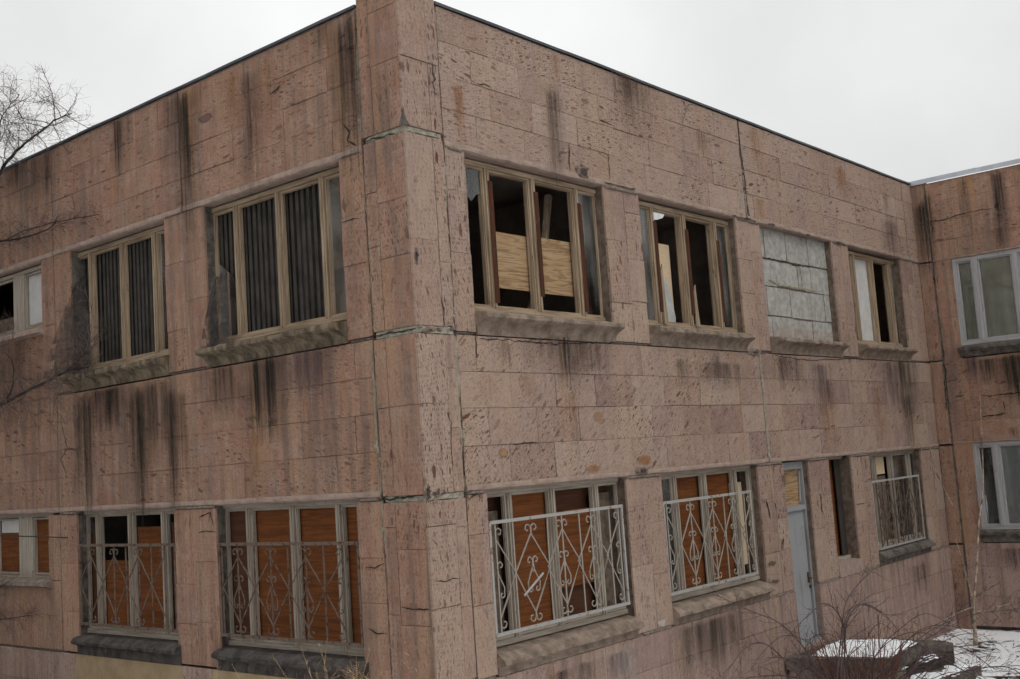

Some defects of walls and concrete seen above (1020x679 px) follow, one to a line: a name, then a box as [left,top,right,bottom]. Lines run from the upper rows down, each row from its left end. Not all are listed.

water stain [172,97,193,177]
water stain [250,361,274,428]
water stain [129,386,182,490]